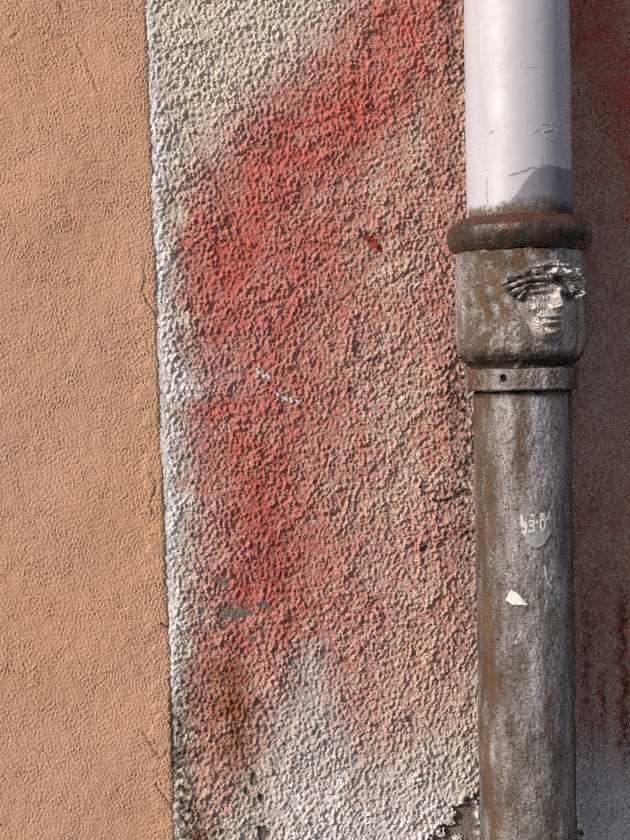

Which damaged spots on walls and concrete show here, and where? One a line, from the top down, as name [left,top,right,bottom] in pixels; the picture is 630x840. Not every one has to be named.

peeling [244,773,264,804]
peeling [257,821,271,840]
peeling [428,790,480,840]